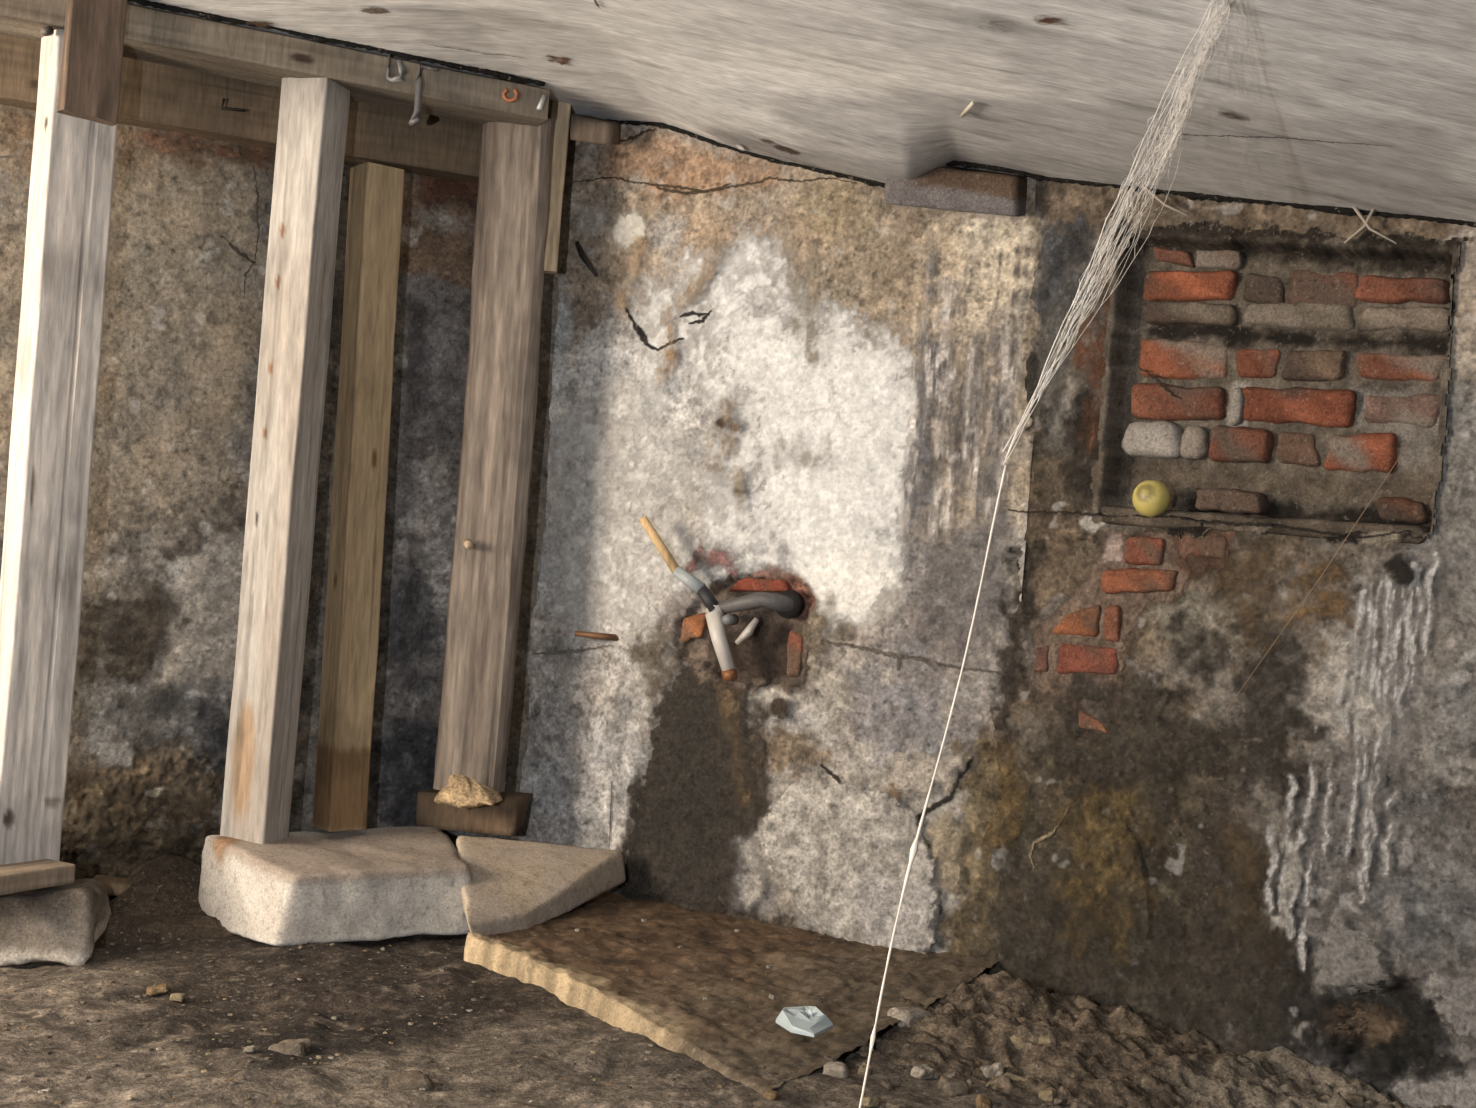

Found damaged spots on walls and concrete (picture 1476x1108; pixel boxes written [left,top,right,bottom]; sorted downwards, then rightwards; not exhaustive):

crack [128,0,545,86]
peeling [580,210,646,248]
crack [573,119,885,195]
crack [625,307,712,351]
peeling [543,235,933,720]
damp [900,212,1110,752]
flaking render [1021,516,1234,739]
damp [622,660,775,915]
crack [820,764,842,785]
crack [915,755,974,915]
damp [977,552,1446,1054]